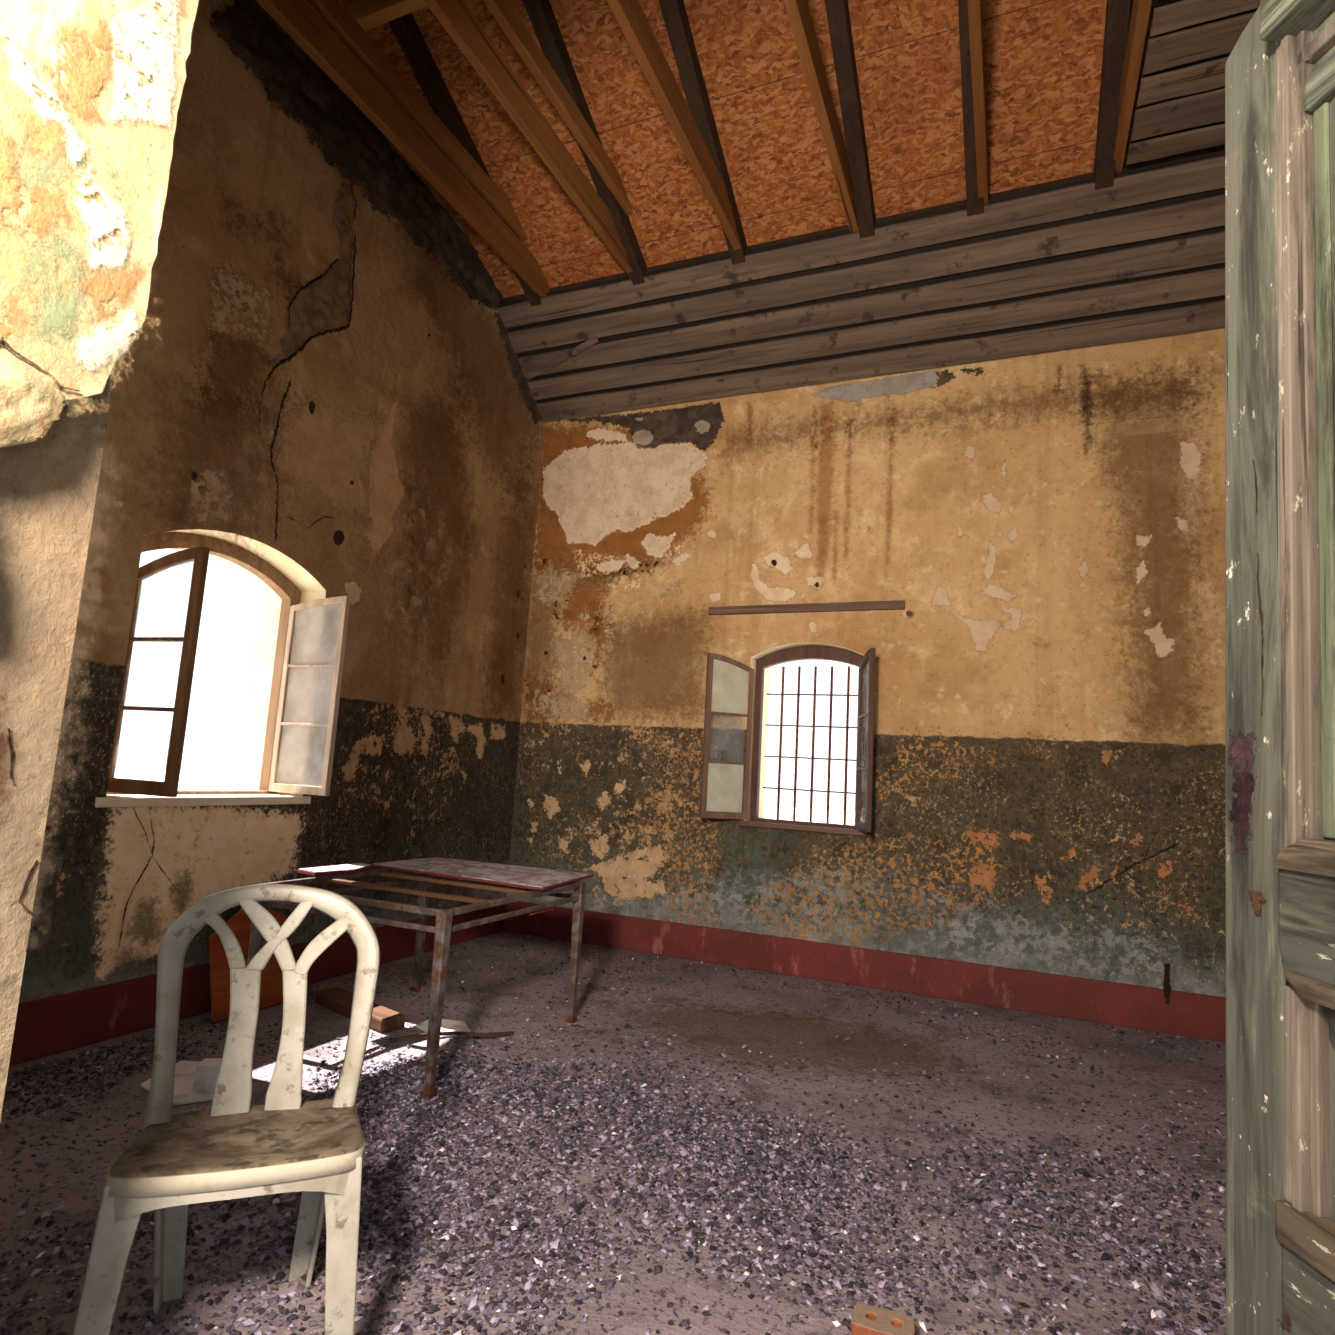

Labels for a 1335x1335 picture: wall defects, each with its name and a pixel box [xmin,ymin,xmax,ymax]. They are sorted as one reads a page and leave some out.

peeling [0,0,184,410]
flaking render [205,0,725,618]
crack [0,337,81,391]
crack [259,184,357,541]
peeling [1179,441,1202,480]
peeling [749,543,822,602]
peeling [1135,535,1152,585]
peeling [1143,607,1175,658]
crack [7,728,15,786]
crack [18,860,39,918]
crack [118,807,179,948]
damp [645,861,1182,991]